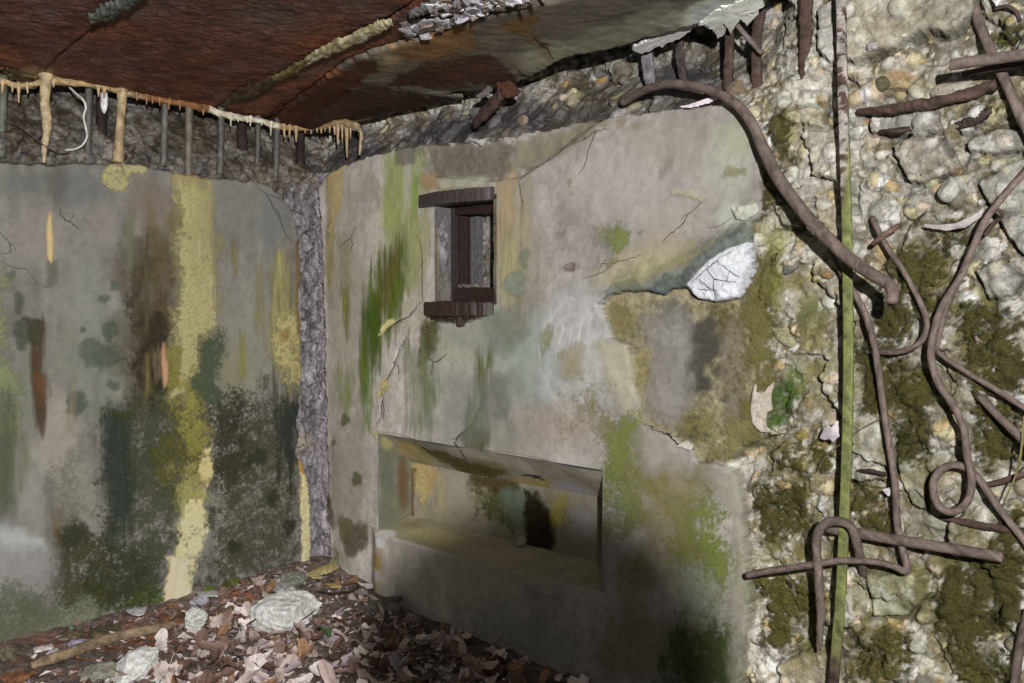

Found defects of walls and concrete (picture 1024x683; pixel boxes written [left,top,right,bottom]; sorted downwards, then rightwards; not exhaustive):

spalling [0,79,185,174]
corrosion [95,89,108,136]
leakage [102,163,147,192]
corrosion [264,28,516,166]
spalling [192,40,713,193]
corrosion [29,321,46,434]
leakage [0,173,311,642]
leakage [363,147,427,427]
crack [376,235,423,424]
crack [582,202,739,306]
crack [643,423,696,450]
spalling [603,0,1024,683]